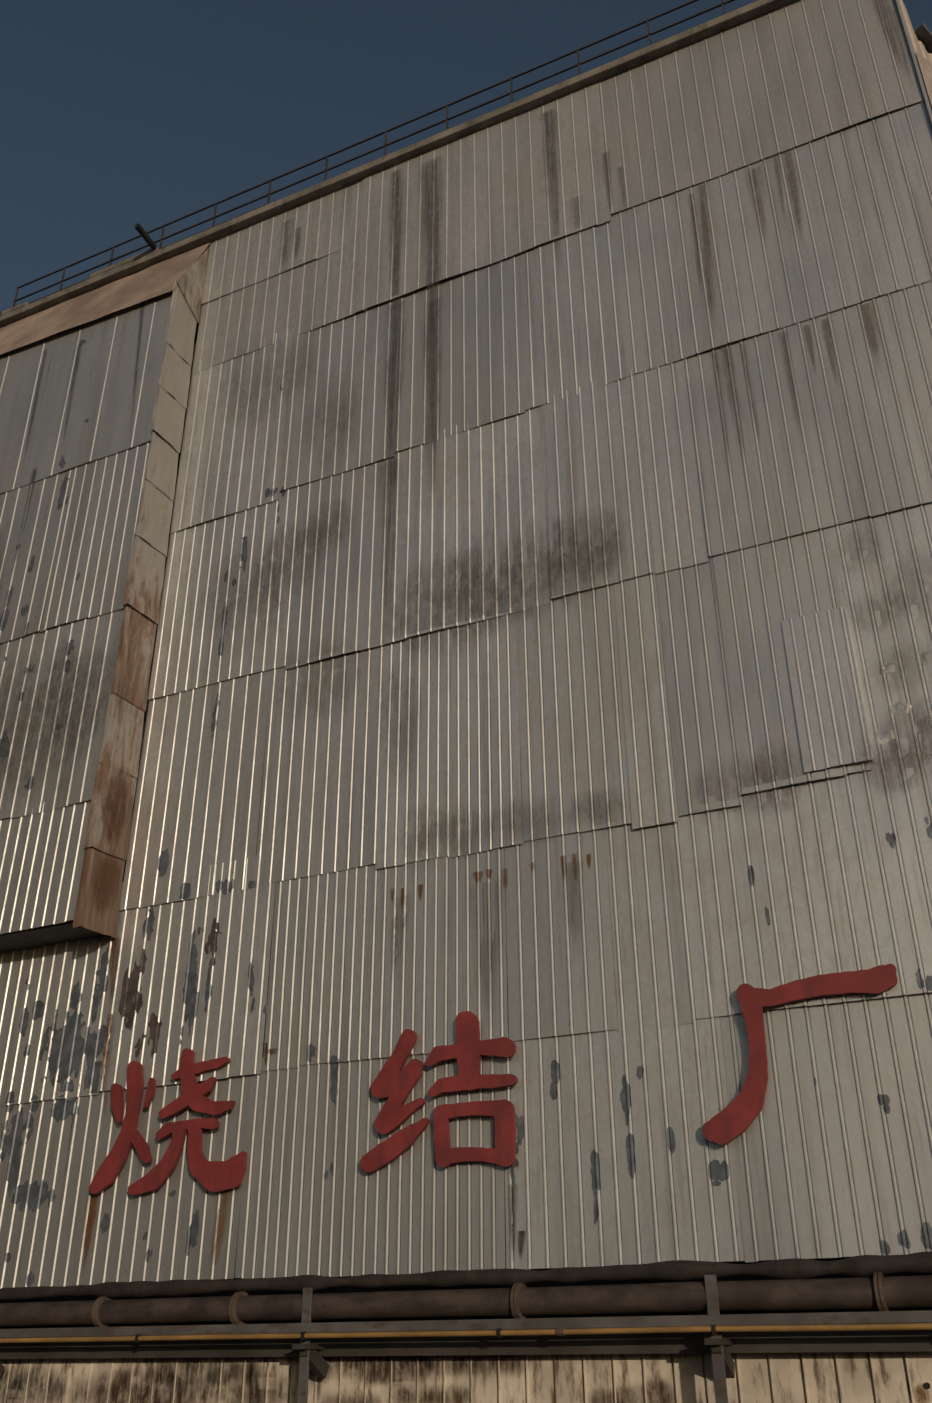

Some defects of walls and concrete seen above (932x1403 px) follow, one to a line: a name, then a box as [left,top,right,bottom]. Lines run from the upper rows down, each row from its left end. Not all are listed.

leakage [388,172,402,478]
leakage [425,160,439,450]
peeling [215,879,256,895]
peeling [179,917,222,1045]
peeling [0,906,162,1213]
peeling [100,1213,110,1234]
peeling [186,1209,199,1256]